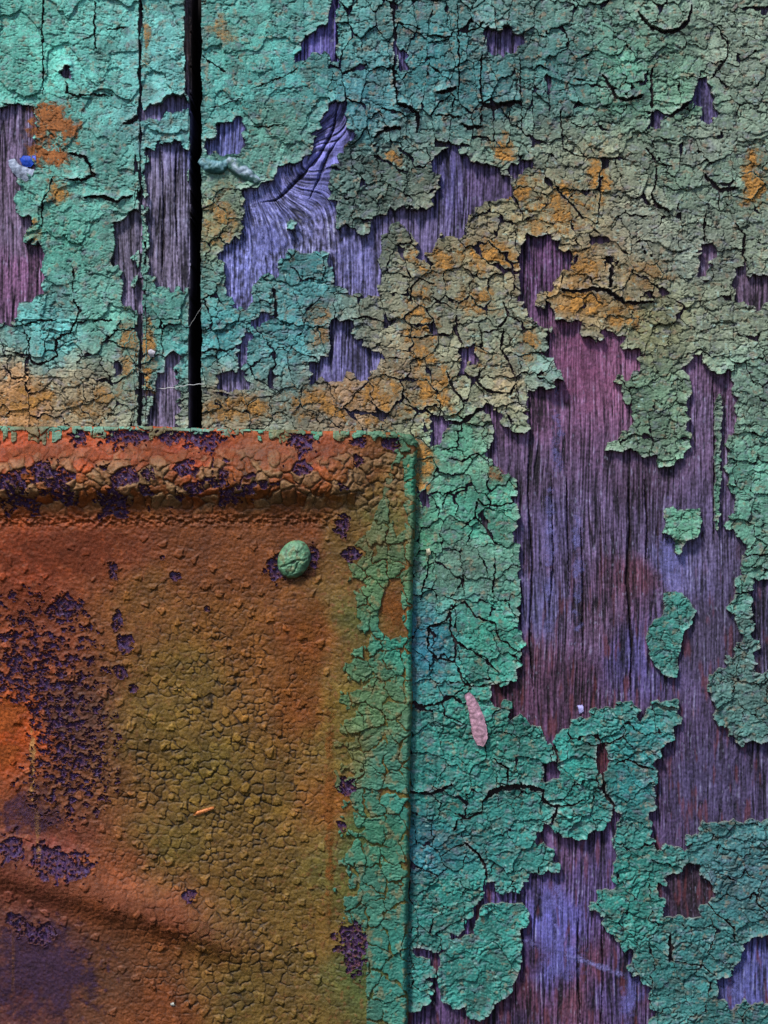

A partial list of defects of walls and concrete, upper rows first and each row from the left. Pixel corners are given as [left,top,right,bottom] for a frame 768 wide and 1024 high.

crack [375,0,523,138]
crack [41,153,132,225]
peeling [0,0,539,476]
crack [356,278,521,426]
crack [561,256,655,305]
peeling [172,458,280,508]
crack [412,448,585,724]
peeling [324,0,768,1024]
corrosion [0,696,40,851]
peeling [0,834,100,886]
peeling [0,584,139,831]
crack [442,733,648,878]